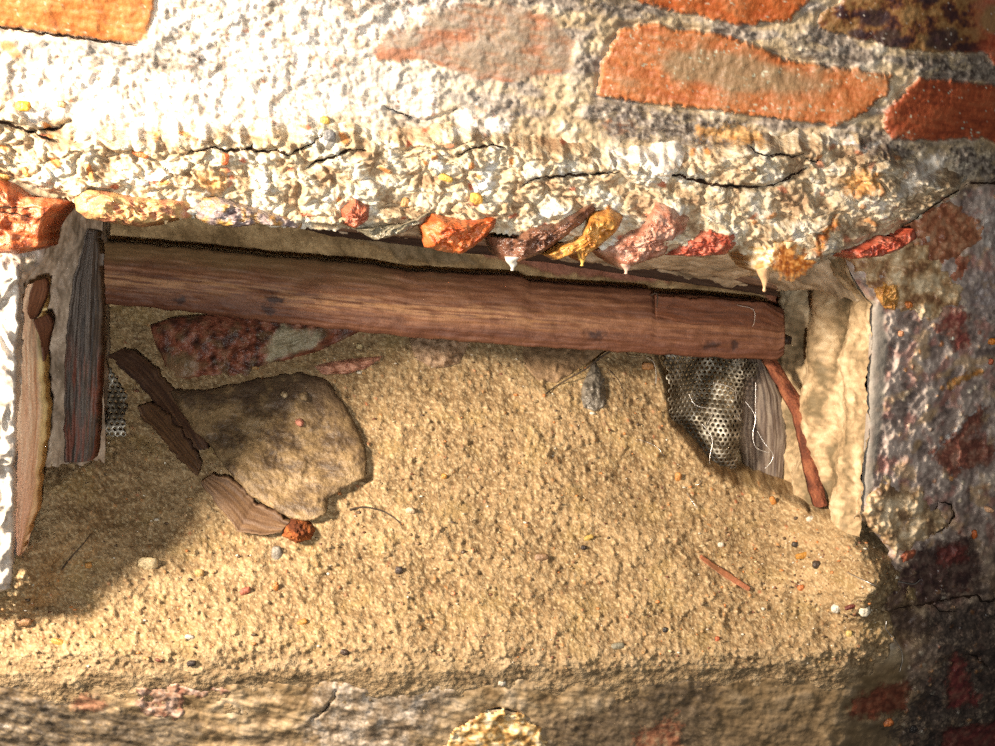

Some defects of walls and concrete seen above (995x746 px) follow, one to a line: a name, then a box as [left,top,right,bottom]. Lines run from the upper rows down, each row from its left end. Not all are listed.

crack [0,121,64,143]
crack [186,135,365,168]
crack [458,144,505,155]
crack [522,172,619,186]
crack [672,147,820,189]
spalling [0,99,984,592]
crack [890,594,995,613]
leakage [885,536,995,746]